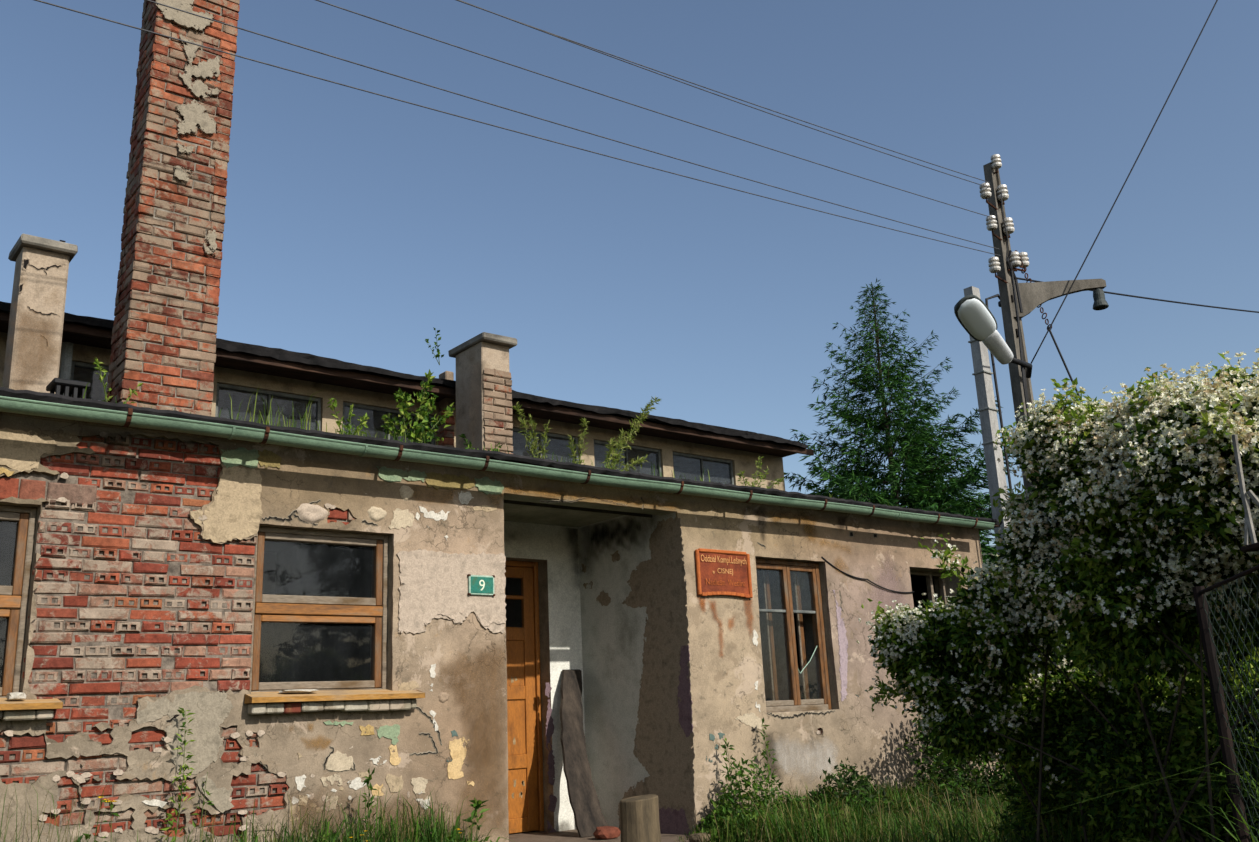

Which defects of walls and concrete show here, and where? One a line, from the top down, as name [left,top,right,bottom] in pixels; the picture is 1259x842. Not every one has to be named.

flaking render [155,0,223,182]
flaking render [203,230,217,257]
crack [28,263,66,275]
crack [27,306,60,348]
spalling [0,428,430,838]
peeling [398,664,436,691]
peeling [429,710,475,786]